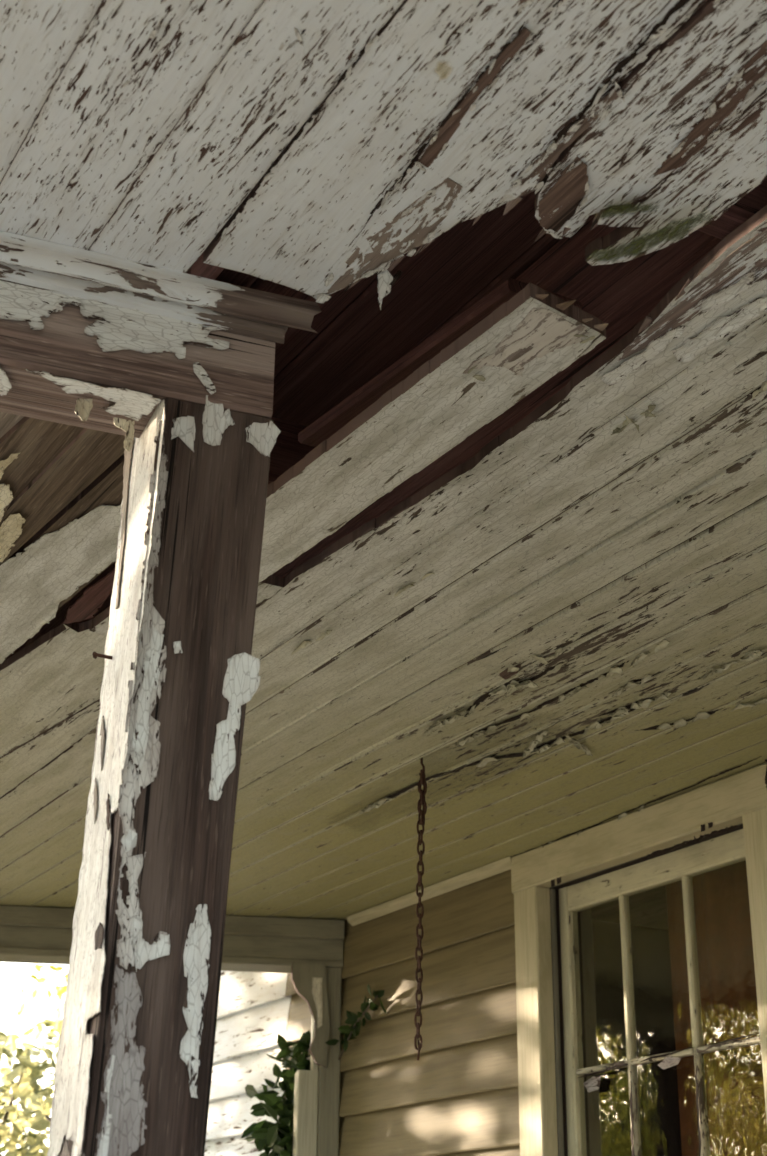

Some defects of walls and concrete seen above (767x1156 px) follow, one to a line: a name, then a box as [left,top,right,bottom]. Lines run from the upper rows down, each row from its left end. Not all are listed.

peeling [415,0,534,171]
peeling [497,80,625,239]
peeling [654,40,767,175]
peeling [316,178,462,310]
peeling [463,308,595,382]
peeling [599,229,767,386]
peeling [0,280,281,1156]
peeling [498,647,563,682]
crack [358,639,767,816]